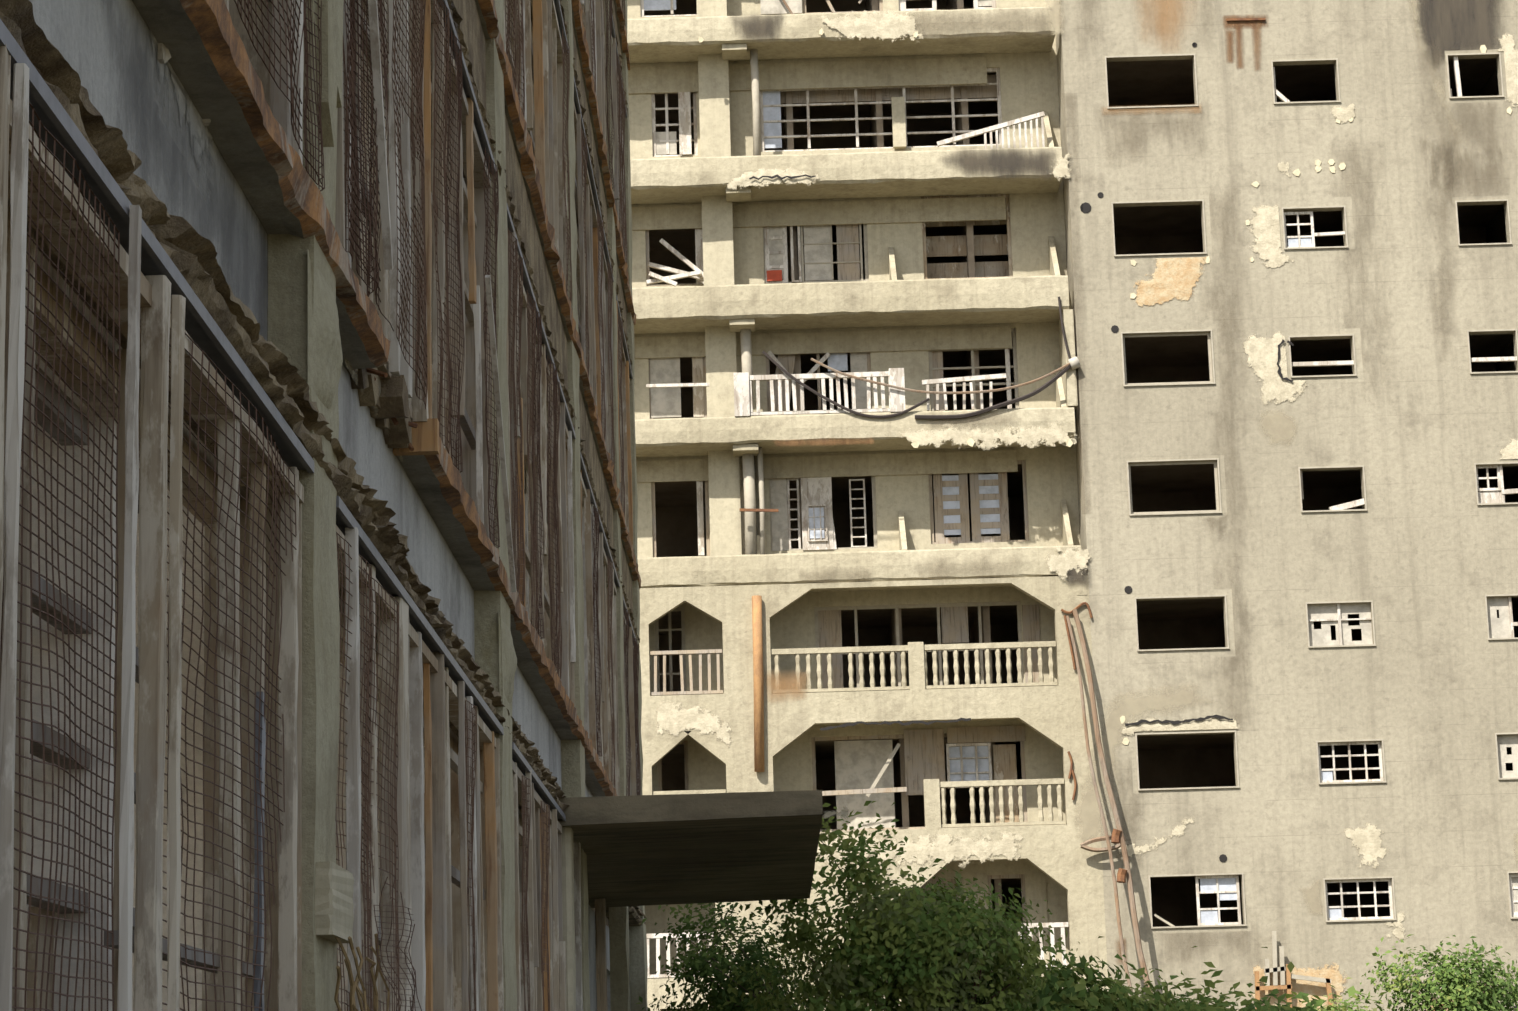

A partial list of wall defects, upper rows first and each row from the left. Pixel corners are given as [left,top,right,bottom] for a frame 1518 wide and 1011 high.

damp [1417,0,1499,63]
spalling [1480,33,1518,114]
spalling [727,167,819,190]
spalling [1277,159,1346,177]
spalling [1246,204,1293,268]
spalling [1130,256,1210,307]
spalling [1243,331,1307,405]
spalling [900,421,1077,449]
spalling [1500,438,1518,459]
spalling [656,702,732,747]
spalling [1344,822,1387,869]